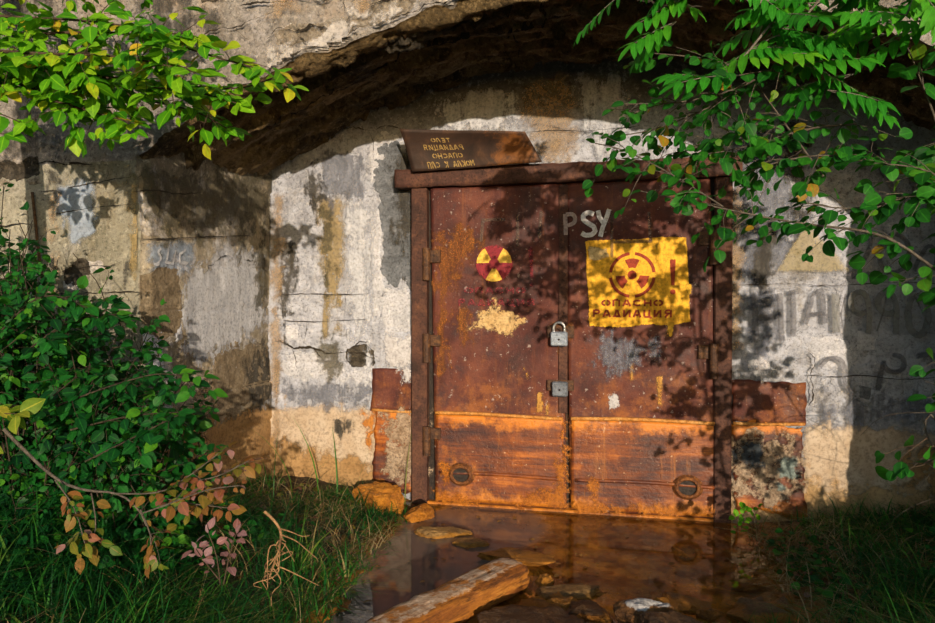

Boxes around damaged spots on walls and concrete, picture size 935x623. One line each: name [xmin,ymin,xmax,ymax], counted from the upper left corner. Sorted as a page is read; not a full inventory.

spalling [275,0,416,59]
water stain [389,153,411,256]
water stain [304,149,376,372]
corrosion [432,223,485,376]
water stain [146,217,411,496]
spalling [206,324,375,420]
corrosion [537,392,549,415]
corrosion [433,462,479,506]
corrosion [515,424,715,519]